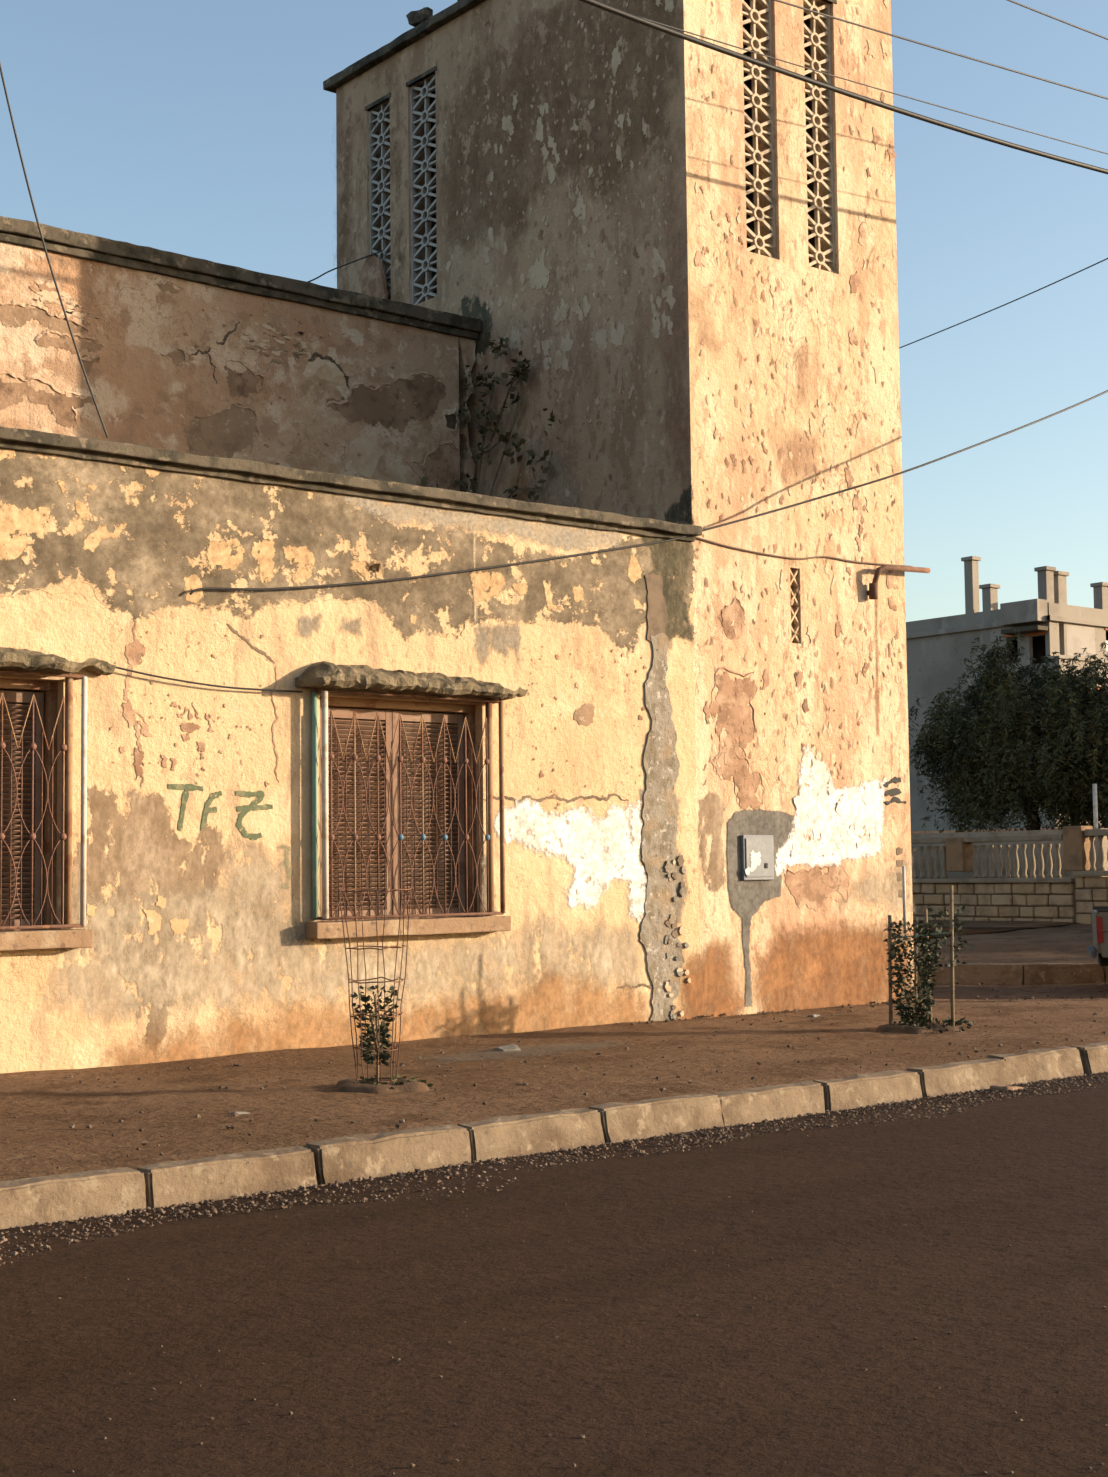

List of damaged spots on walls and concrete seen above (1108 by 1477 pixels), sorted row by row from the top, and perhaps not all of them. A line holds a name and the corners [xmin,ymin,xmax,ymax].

flaking render [0,281,104,428]
flaking render [160,306,460,490]
peeling [694,206,819,343]
damp [0,439,698,663]
flaking render [702,327,903,810]
rust [64,677,73,924]
damp [639,789,647,890]
damp [672,794,688,929]